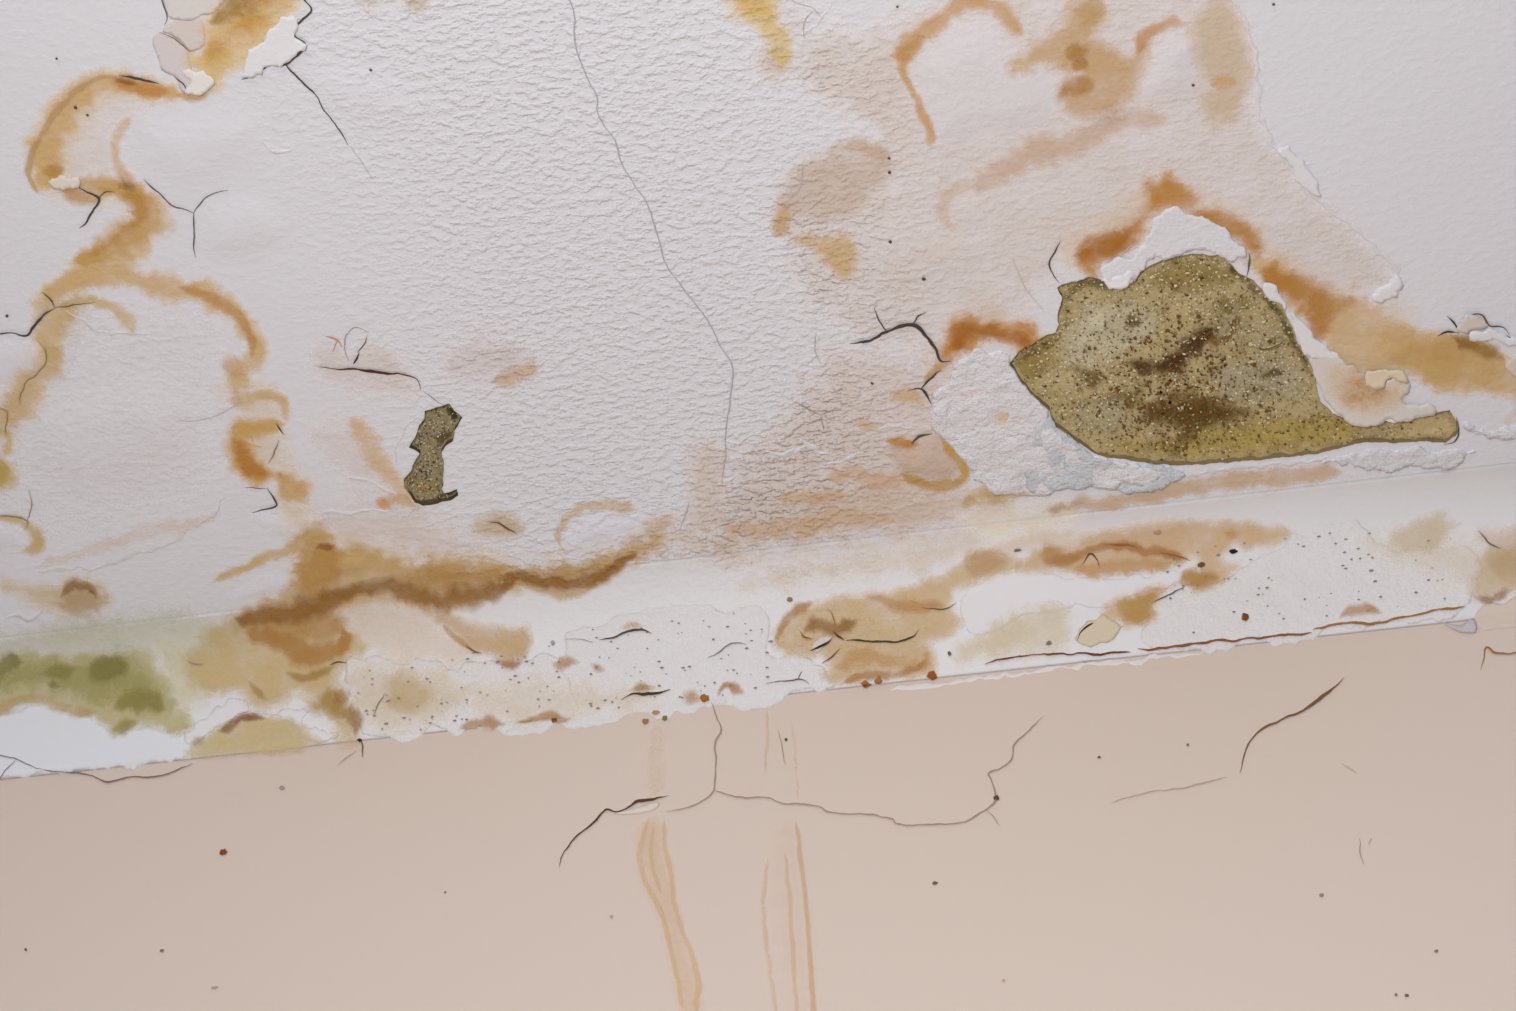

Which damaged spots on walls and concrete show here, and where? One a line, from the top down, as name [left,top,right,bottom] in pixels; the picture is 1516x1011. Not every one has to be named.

peeling [153,0,226,96]
peeling [242,16,307,79]
leakage [0,0,306,500]
crack [79,181,228,254]
leakage [737,0,1385,339]
crack [324,327,443,405]
spalling [404,404,462,506]
crack [814,308,950,444]
spalling [930,206,1516,496]
leakage [0,362,968,757]
leakage [776,521,1289,682]
crack [559,704,1042,866]